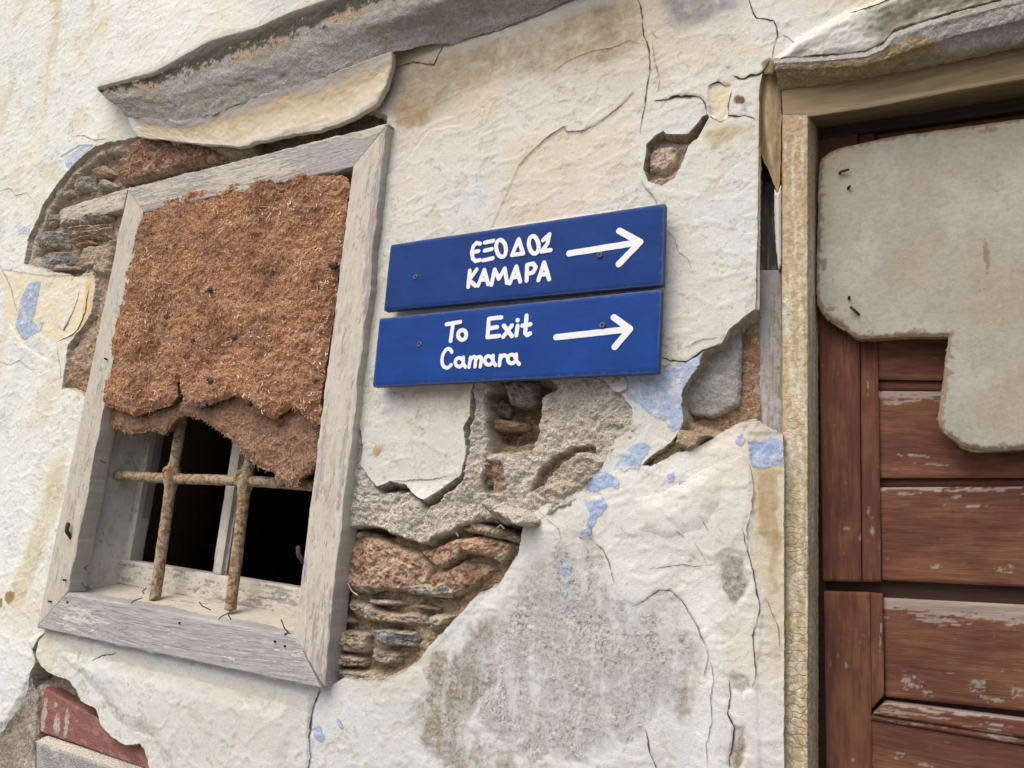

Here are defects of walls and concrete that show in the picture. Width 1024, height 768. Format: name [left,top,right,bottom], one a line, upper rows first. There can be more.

crack [518,0,795,166]
spalling [649,140,692,186]
spalling [15,115,387,392]
crack [661,337,718,366]
spalling [338,312,783,768]
crack [633,467,780,768]
spalling [0,673,149,768]